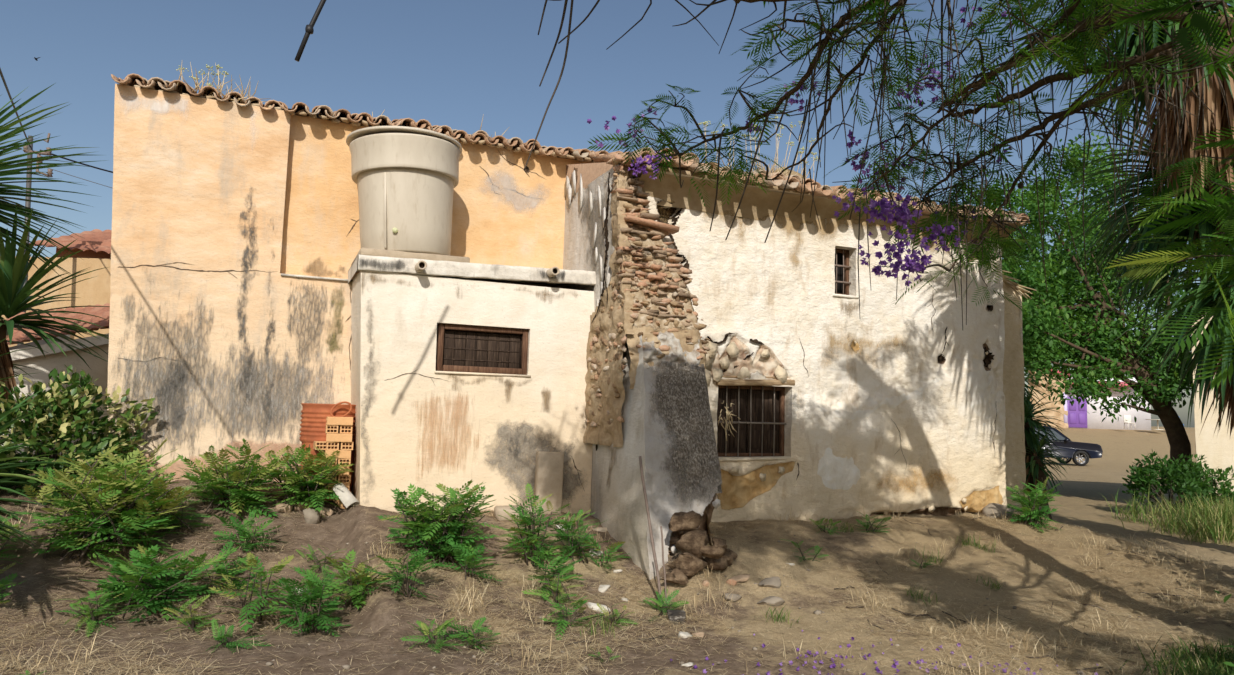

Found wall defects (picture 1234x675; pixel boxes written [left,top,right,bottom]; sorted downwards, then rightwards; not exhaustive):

leakage [117,300,216,449]
leakage [224,200,343,441]
spalling [564,154,791,427]
leakage [486,423,582,507]
spalling [668,461,796,556]